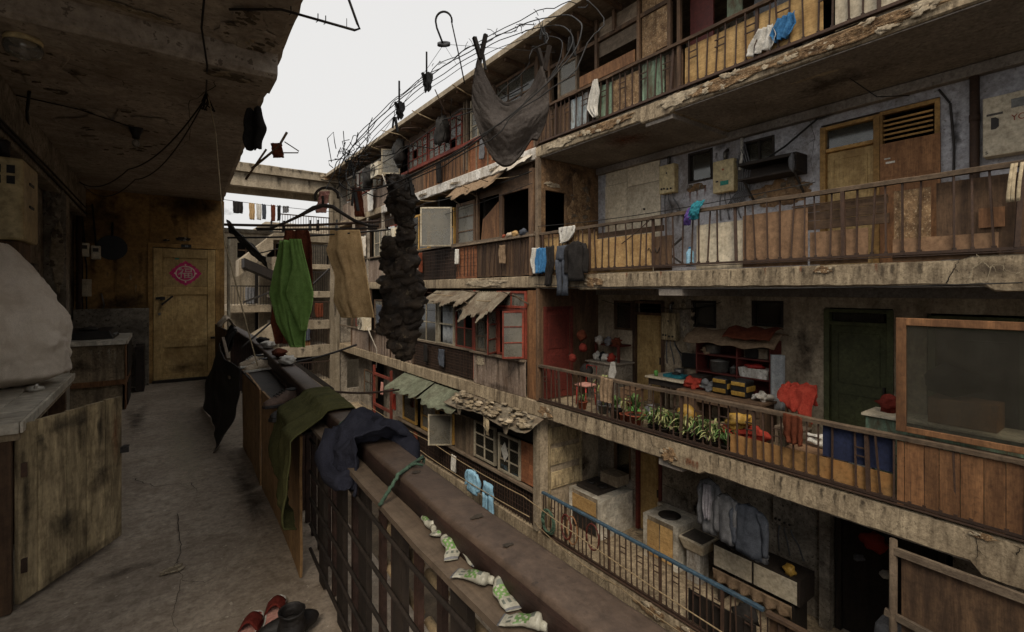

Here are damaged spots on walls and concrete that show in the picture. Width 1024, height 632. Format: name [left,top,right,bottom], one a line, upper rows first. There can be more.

spalling [657,0,950,109]